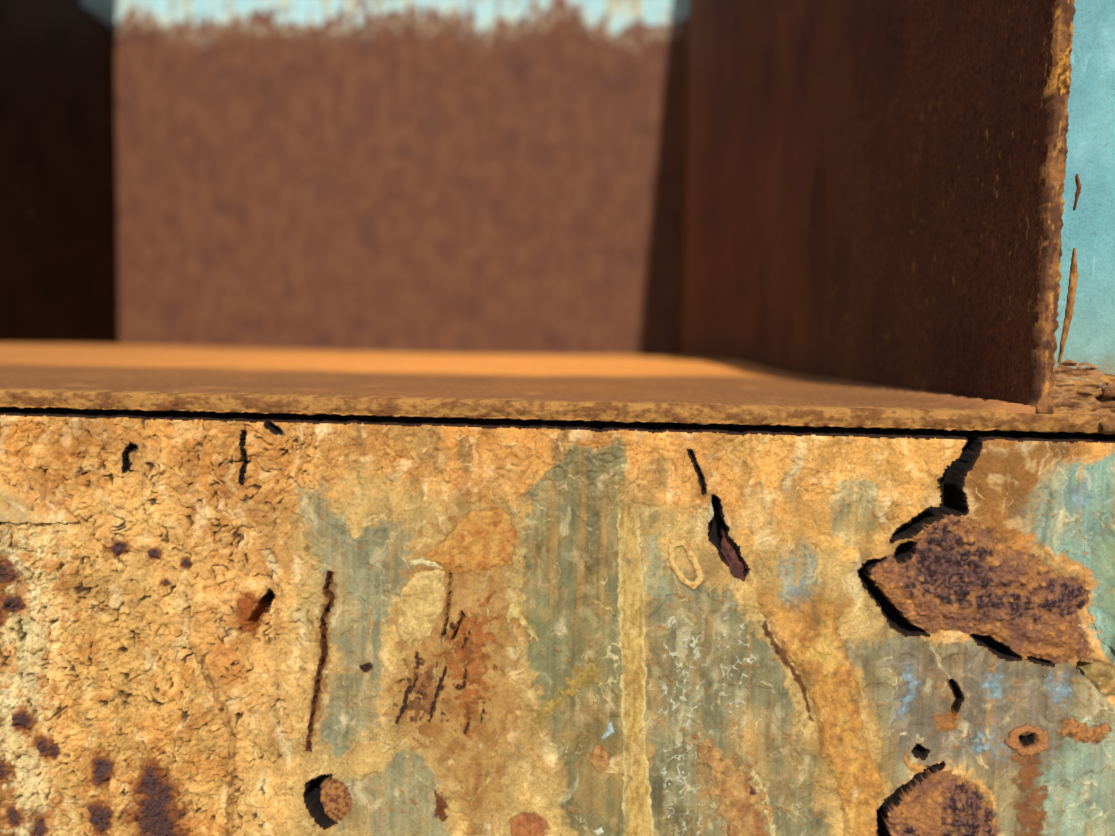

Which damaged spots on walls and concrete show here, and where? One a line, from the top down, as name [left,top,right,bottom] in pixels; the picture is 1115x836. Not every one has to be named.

corrosion [1056,48,1072,95]
peeling [0,479,79,525]
corrosion [0,555,26,637]
corrosion [108,539,130,558]
corrosion [148,548,162,559]
corrosion [180,557,192,570]
crack [0,407,1115,752]
corrosion [0,709,60,760]
corrosion [0,760,48,836]
corrosion [87,748,191,836]